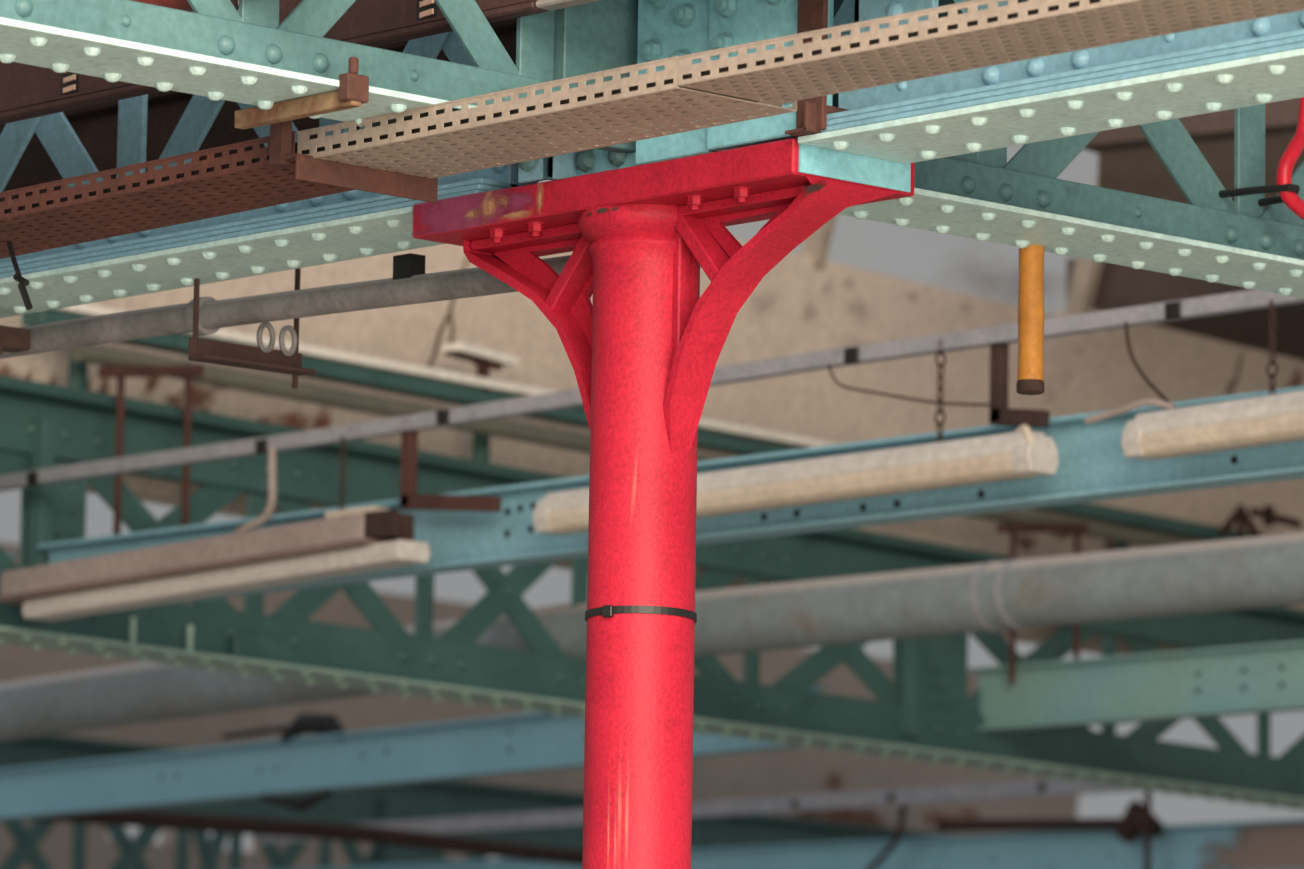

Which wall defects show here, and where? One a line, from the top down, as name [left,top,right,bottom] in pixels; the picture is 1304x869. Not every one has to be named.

peeling [412,188,542,235]
rust [260,410,330,429]
peeling [1202,823,1304,869]